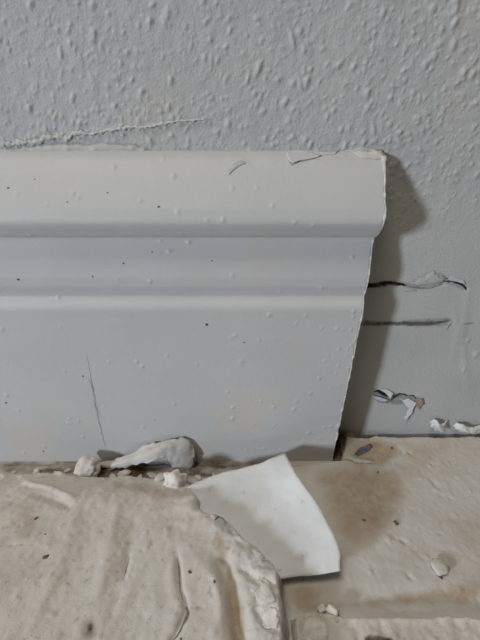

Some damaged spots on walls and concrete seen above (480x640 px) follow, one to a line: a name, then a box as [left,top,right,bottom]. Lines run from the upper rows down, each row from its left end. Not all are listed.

crack [367,271,467,292]
crack [366,319,450,327]
spalling [373,388,423,421]
peeling [429,419,480,438]
damp [333,436,346,461]